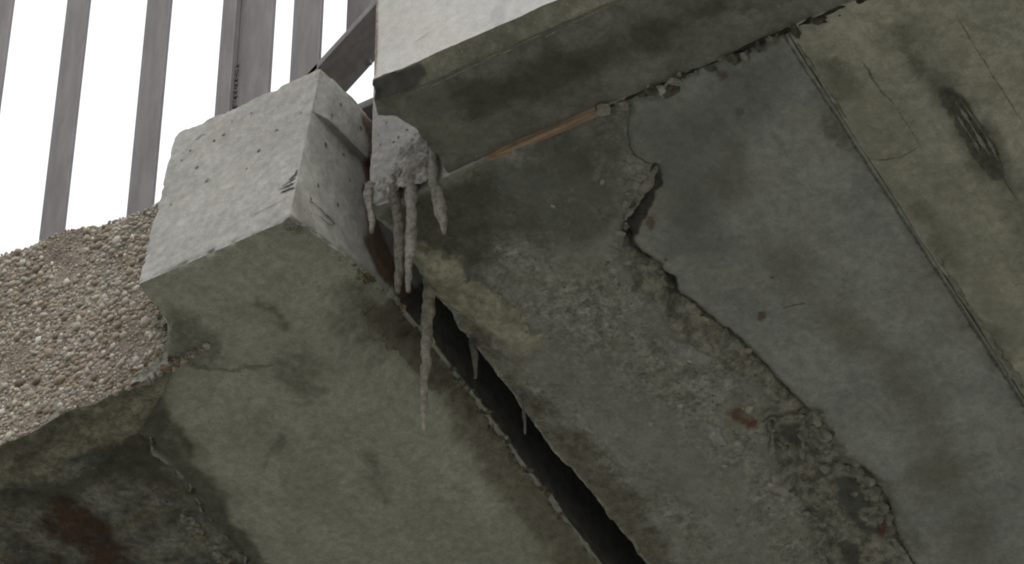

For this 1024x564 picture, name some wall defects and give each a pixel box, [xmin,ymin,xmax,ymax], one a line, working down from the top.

damp [363,132,496,294]
spalling [762,405,899,564]